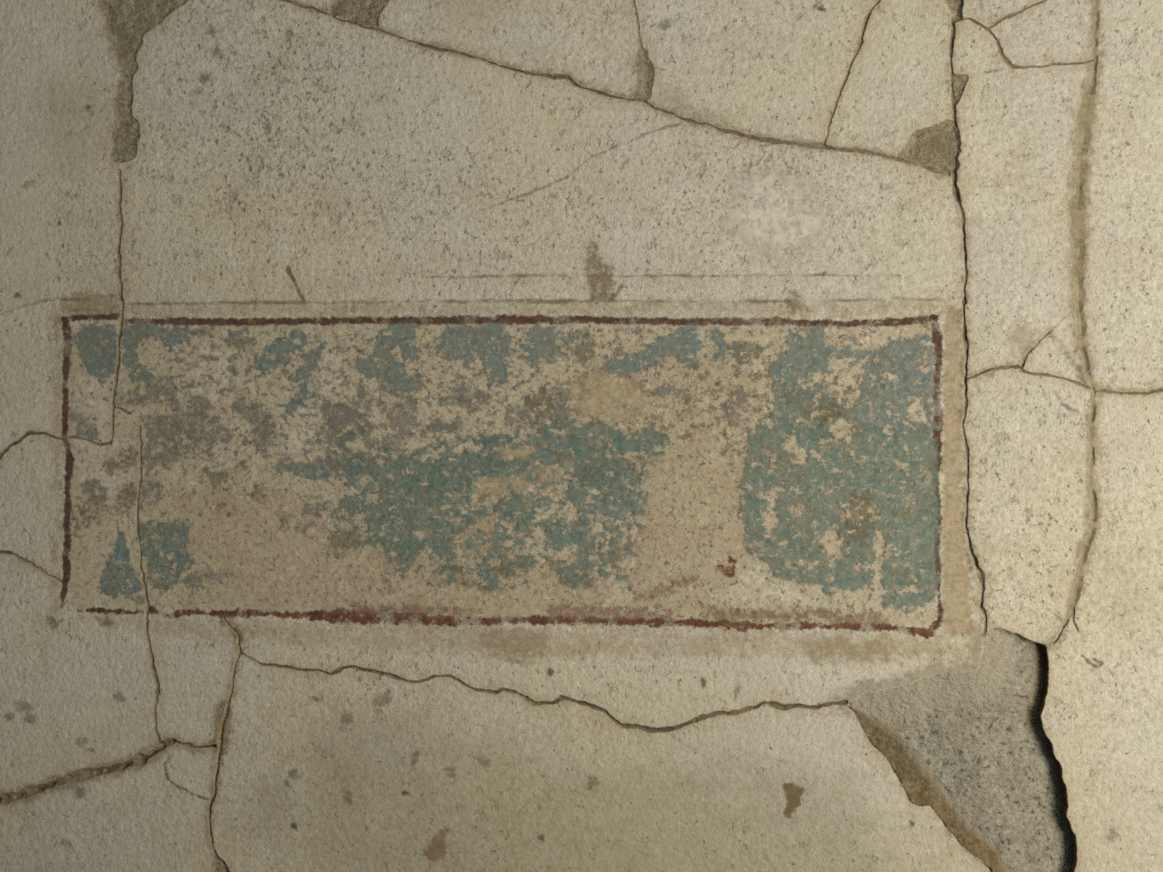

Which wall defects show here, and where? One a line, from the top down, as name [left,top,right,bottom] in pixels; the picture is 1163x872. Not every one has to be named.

crack [0,169,848,844]
crack [280,0,1163,649]
spalling [838,628,1077,872]